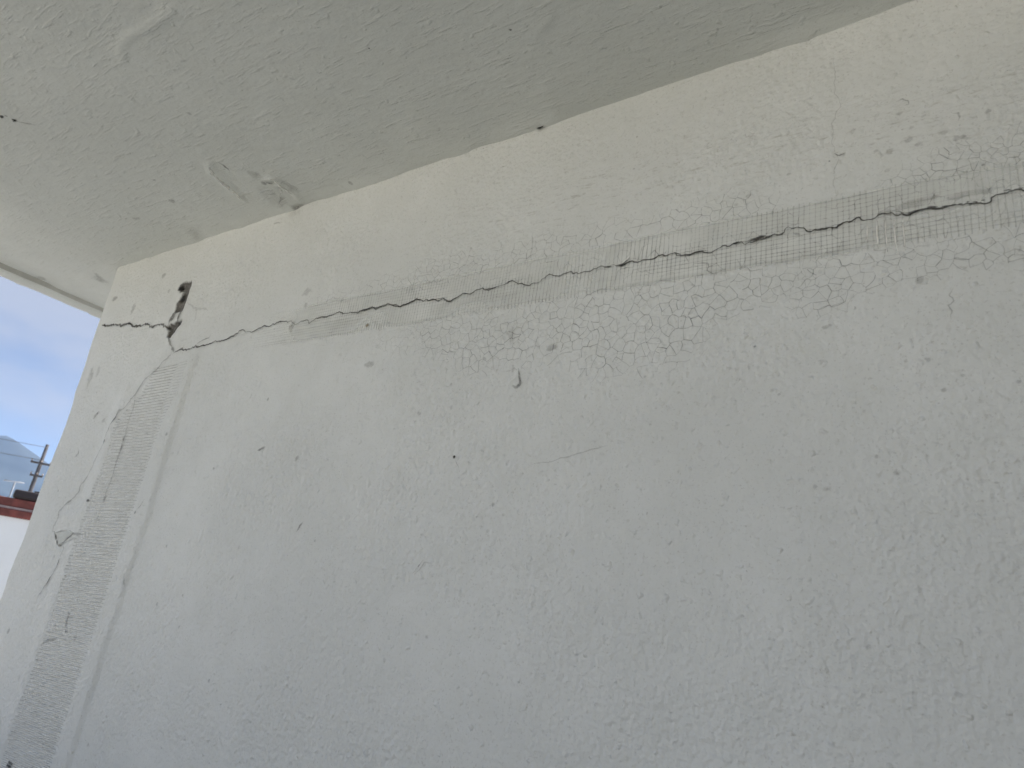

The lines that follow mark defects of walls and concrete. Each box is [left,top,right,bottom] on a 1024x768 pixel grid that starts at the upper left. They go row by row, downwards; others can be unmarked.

flaking render [167,282,192,338]
crack [102,187,1024,353]